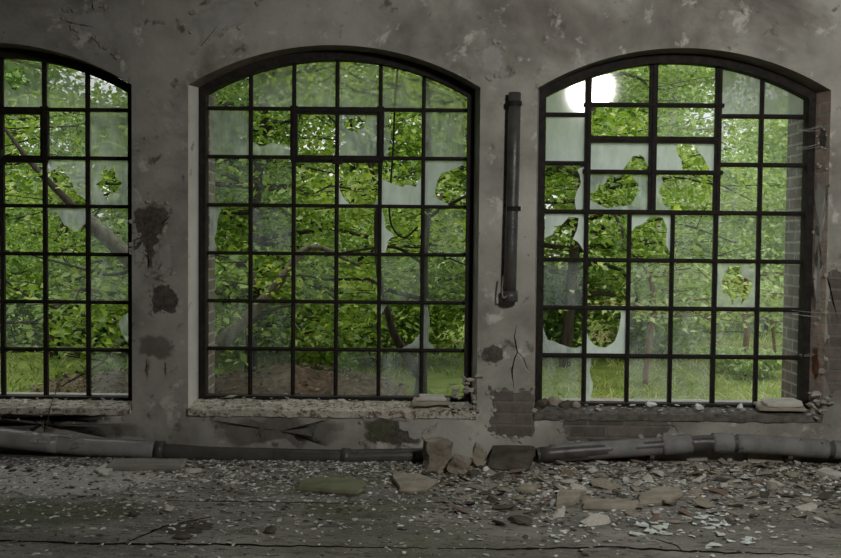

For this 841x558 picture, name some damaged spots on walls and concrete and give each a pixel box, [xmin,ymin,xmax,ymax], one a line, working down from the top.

damp [141,336,171,374]
spalling [478,343,505,365]
flaking render [449,374,538,443]